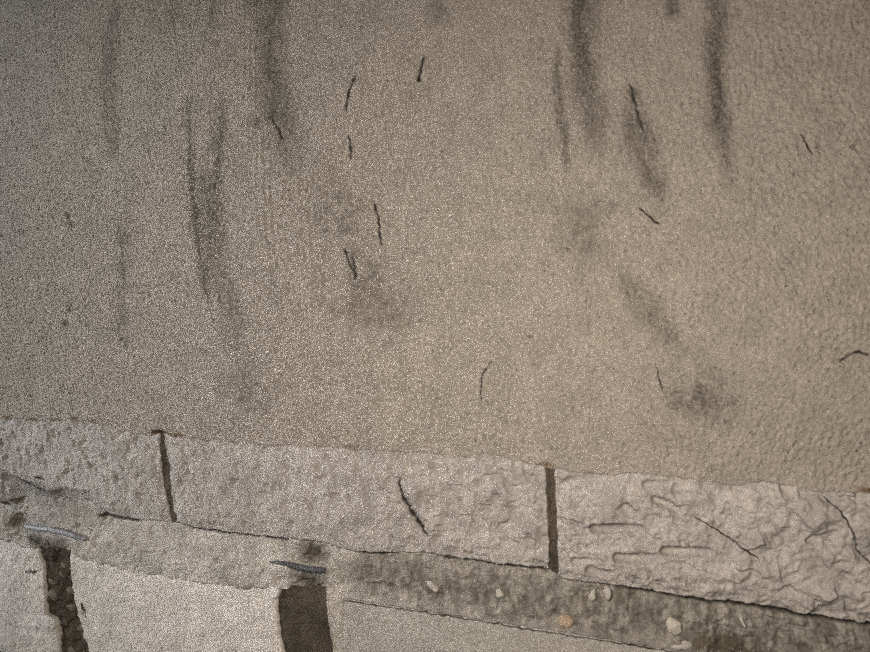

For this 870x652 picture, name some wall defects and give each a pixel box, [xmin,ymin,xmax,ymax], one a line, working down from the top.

spalling [303,542,322,561]
spalling [589,585,611,602]
spalling [665,617,682,636]
spalling [693,635,760,652]